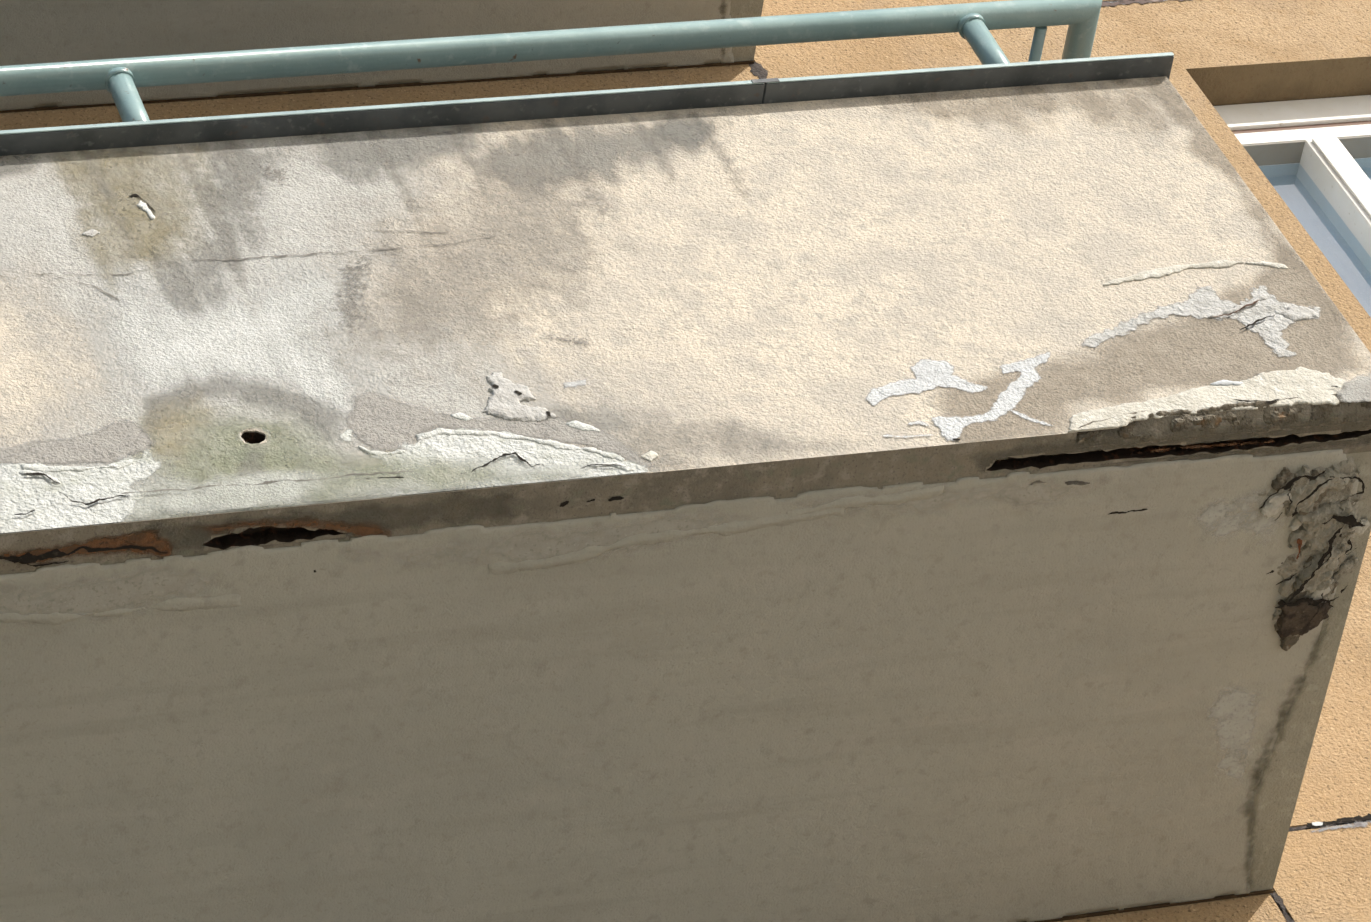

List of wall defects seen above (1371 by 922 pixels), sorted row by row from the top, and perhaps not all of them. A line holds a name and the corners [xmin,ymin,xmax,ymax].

crack [0,270,143,301]
crack [187,230,493,261]
damp [0,118,706,549]
peeling [866,352,1051,441]
peeling [987,285,1371,486]
peeling [0,421,658,533]
corrosion [1,531,172,563]
spalling [204,526,346,549]
corrosion [196,517,390,537]
spalling [1257,456,1371,651]